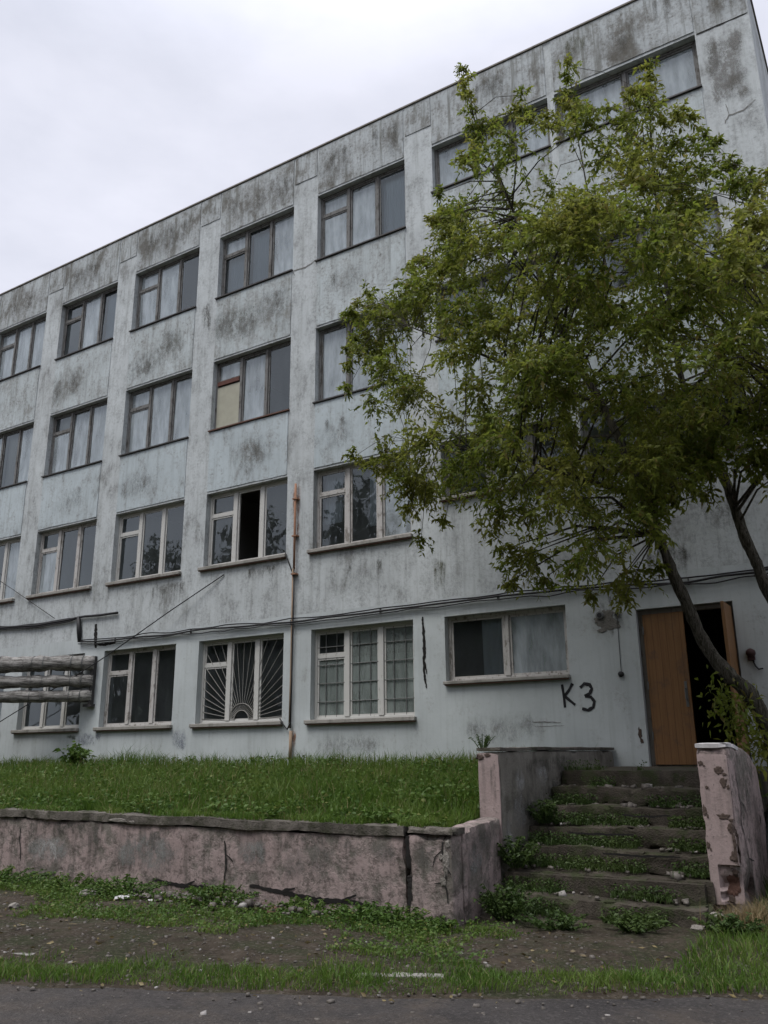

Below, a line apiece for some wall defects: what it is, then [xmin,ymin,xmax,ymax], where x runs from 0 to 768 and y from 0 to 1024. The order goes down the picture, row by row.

peeling [698,761,730,789]
spalling [702,804,741,903]